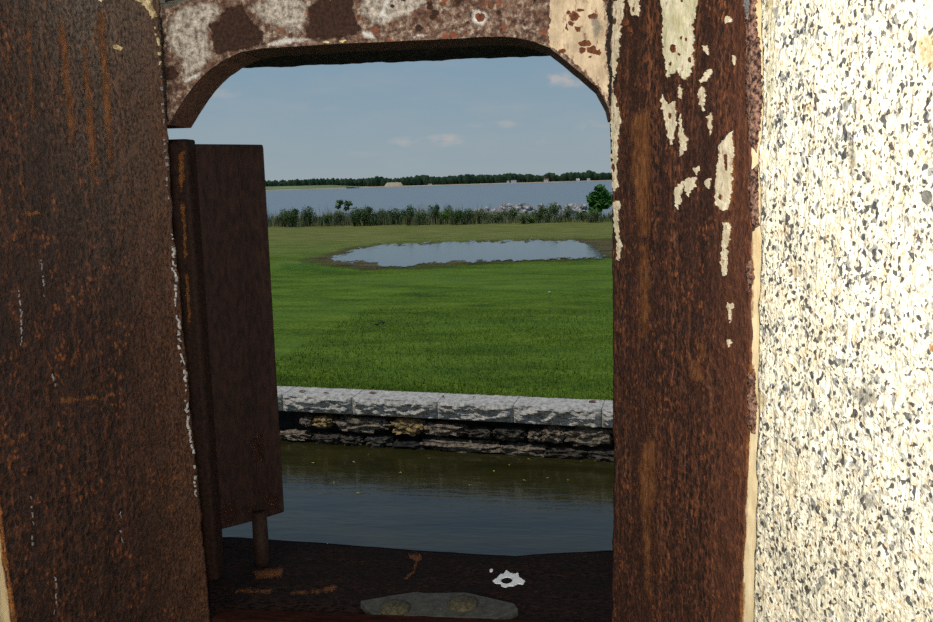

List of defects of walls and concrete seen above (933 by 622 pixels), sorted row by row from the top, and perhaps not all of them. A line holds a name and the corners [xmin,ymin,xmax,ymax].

peeling [169,3,219,76]
rust [209,4,263,54]
peeling [253,0,306,33]
rust [305,0,361,39]
peeling [362,0,426,24]
rust [427,0,461,20]
rust [466,4,512,25]
peeling [660,0,713,157]
peeling [548,0,640,261]
rust [631,109,651,337]
peeling [673,131,735,276]
rust [639,441,657,601]